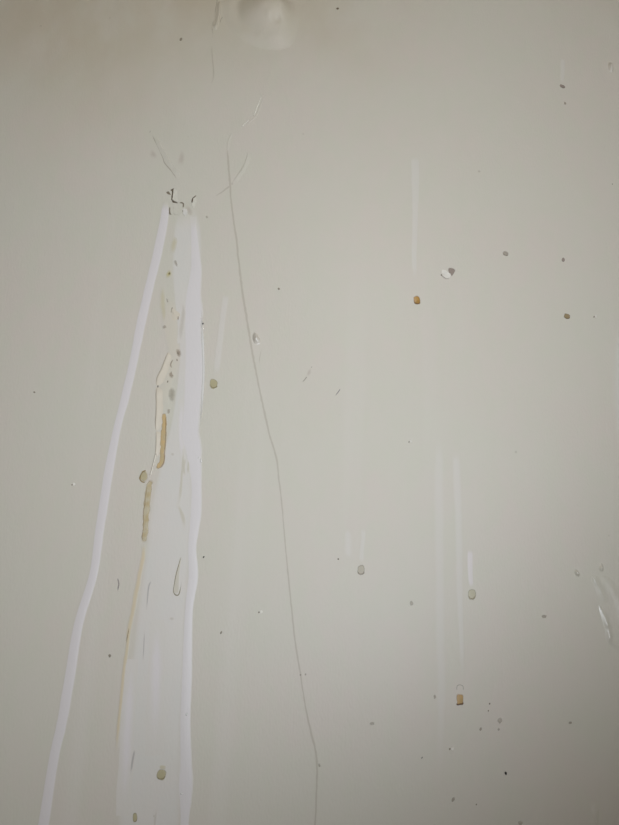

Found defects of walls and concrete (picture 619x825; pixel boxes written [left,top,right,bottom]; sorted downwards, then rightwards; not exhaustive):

leakage [37,201,205,825]
crack [213,133,319,825]